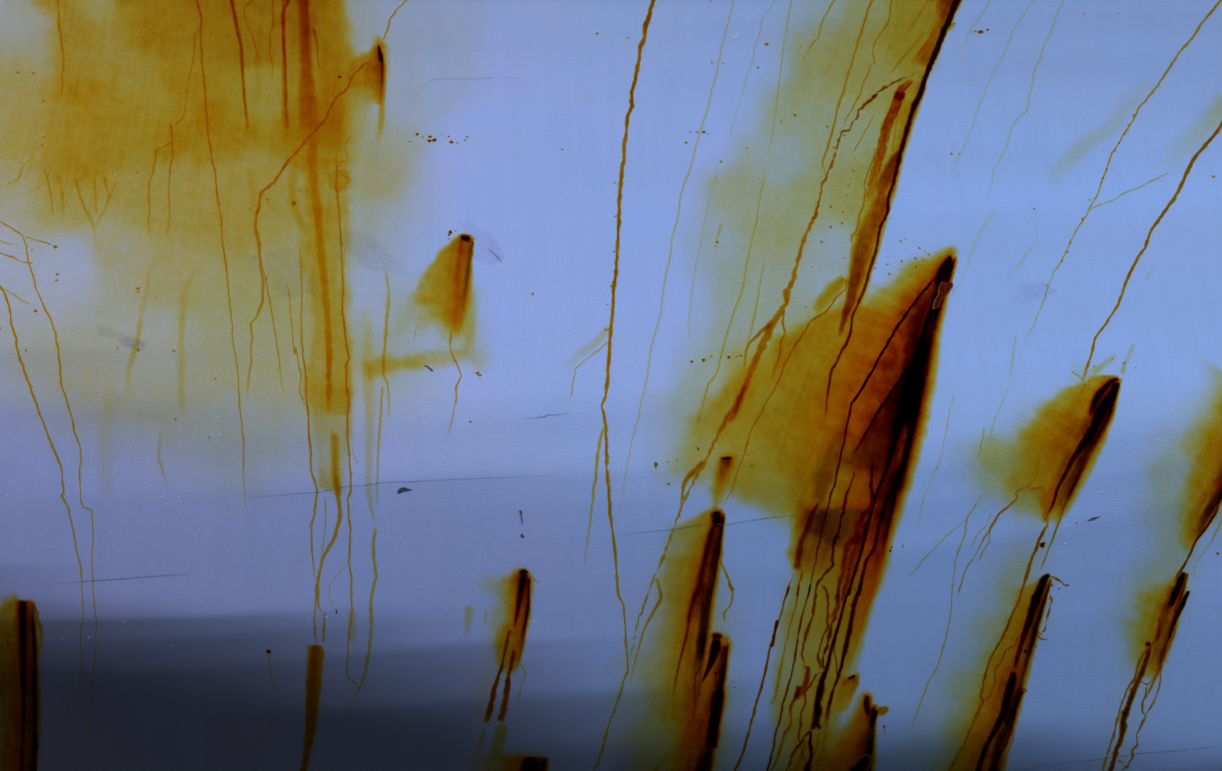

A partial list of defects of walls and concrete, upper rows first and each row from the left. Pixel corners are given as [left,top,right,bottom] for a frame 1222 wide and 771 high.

rust [132,0,342,136]
rust [367,45,384,99]
rust [447,230,474,317]
rust [722,321,774,427]
rust [734,0,961,771]
rust [717,456,733,486]
rust [0,601,42,771]
rust [485,569,531,721]
rust [674,511,735,771]
rust [949,366,1120,771]
rust [1107,461,1222,771]